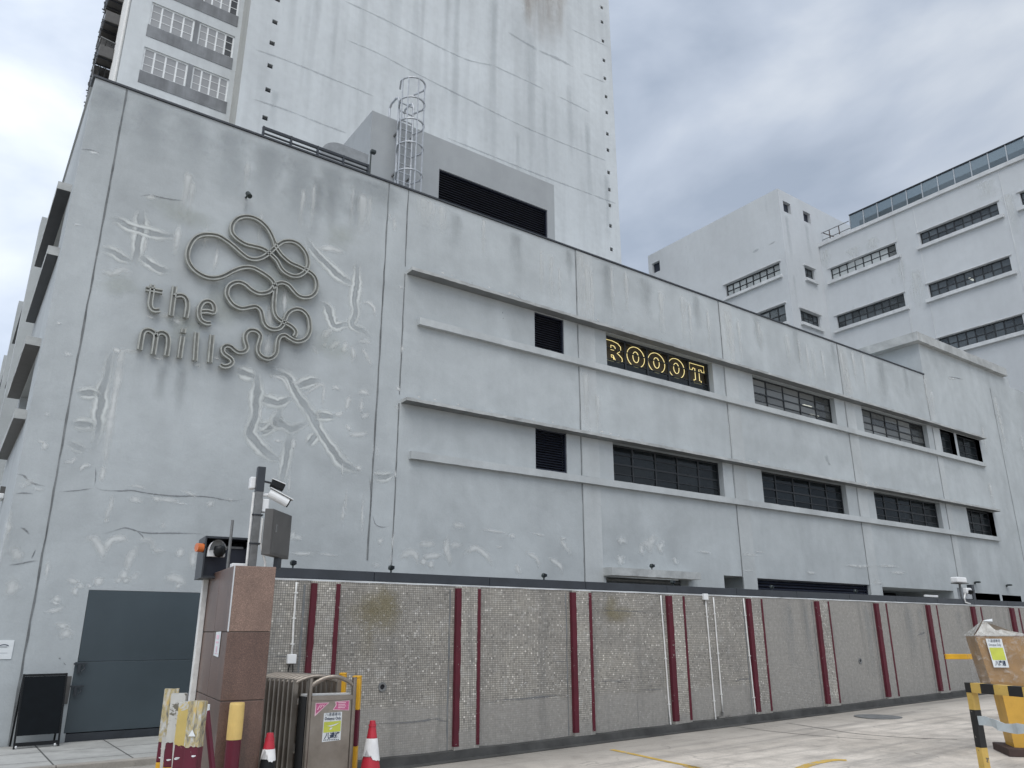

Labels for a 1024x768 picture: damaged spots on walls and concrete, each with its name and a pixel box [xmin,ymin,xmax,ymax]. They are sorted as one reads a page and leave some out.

crack [123,490,222,500]